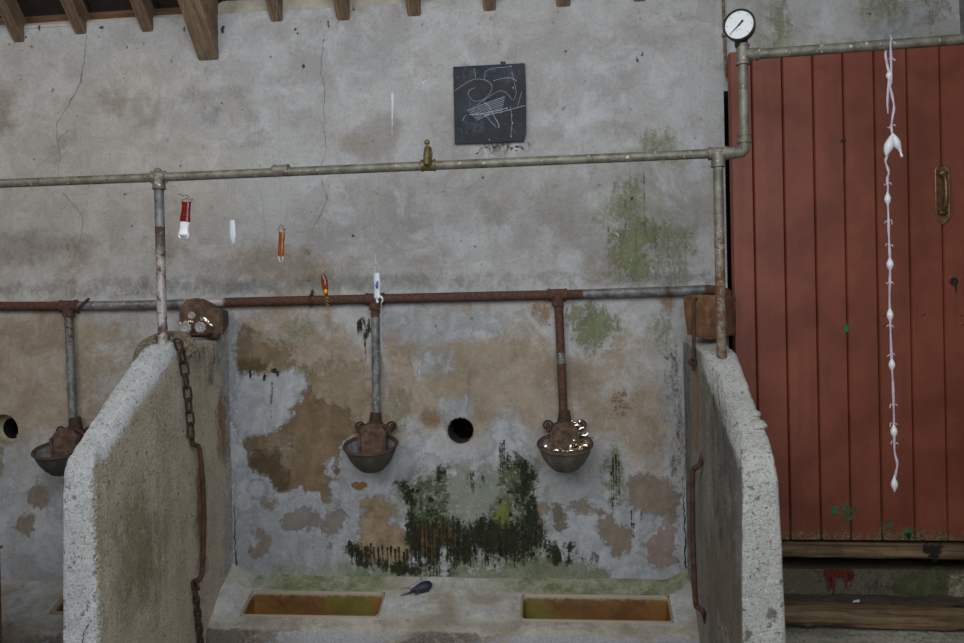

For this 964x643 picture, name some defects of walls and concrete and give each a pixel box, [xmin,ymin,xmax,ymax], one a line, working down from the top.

leakage [608,177,696,286]
peeling [243,386,356,549]
leakage [232,417,533,576]